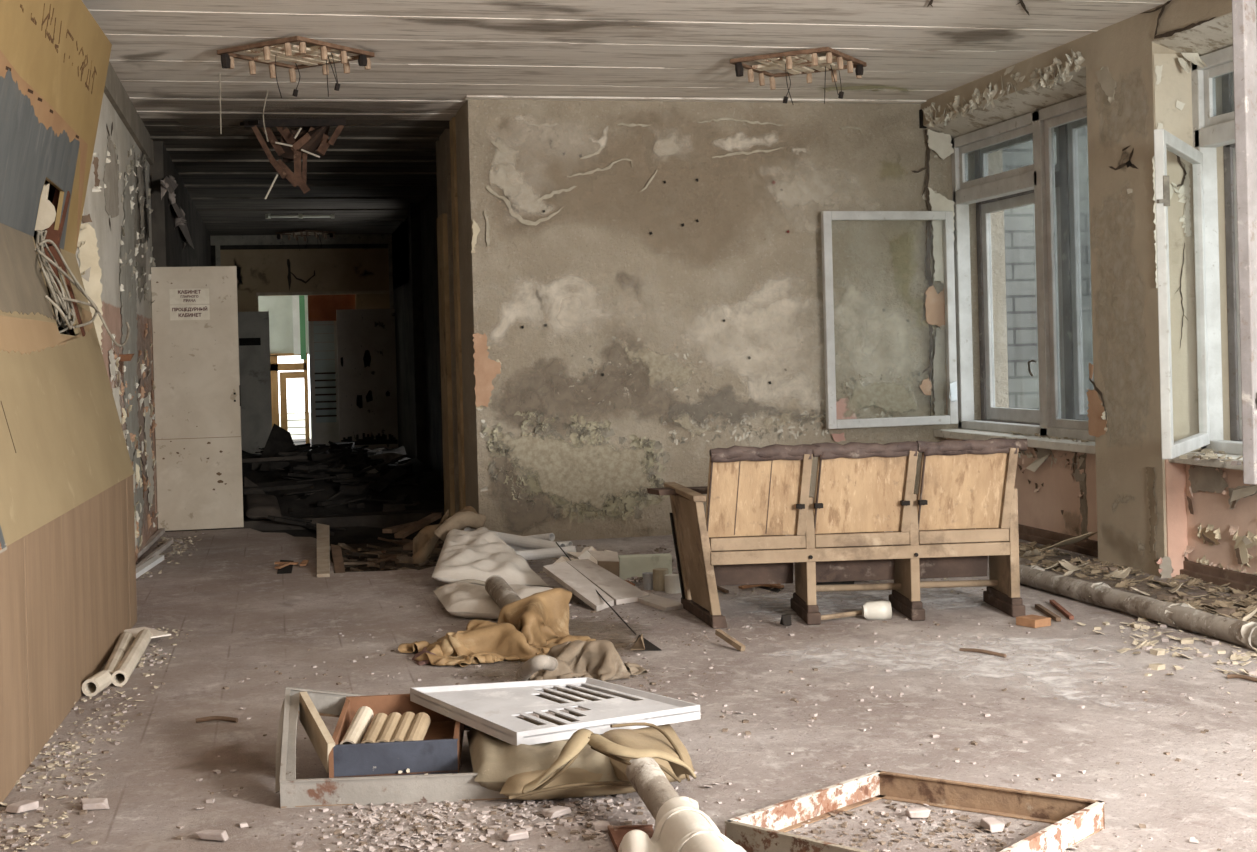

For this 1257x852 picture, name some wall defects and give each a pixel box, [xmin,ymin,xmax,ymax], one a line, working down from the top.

flaking render [486,116,650,226]
flaking render [640,135,680,192]
flaking render [698,118,805,158]
peeling [919,49,1116,160]
peeling [77,122,194,560]
peeling [473,333,502,438]
leakage [492,274,819,429]
peeling [906,187,955,416]
crack [1176,243,1188,347]
peeling [1018,447,1088,539]
peeling [1146,465,1257,593]